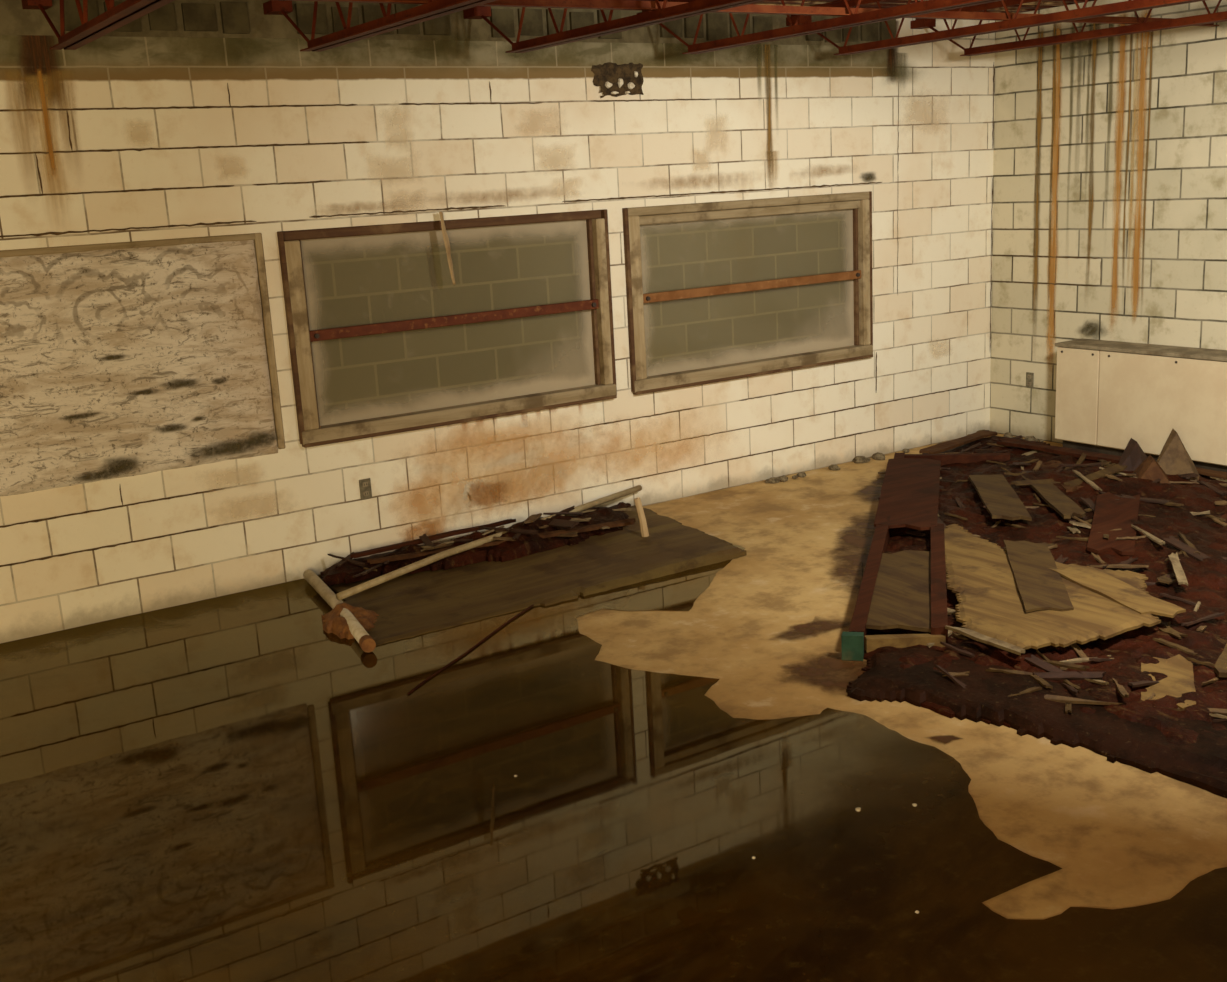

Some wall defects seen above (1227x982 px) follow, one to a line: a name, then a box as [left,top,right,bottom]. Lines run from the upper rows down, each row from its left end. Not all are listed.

corrosion [22,35,63,180]
corrosion [1033,25,1061,359]
water stain [1064,23,1113,264]
corrosion [1111,12,1153,315]